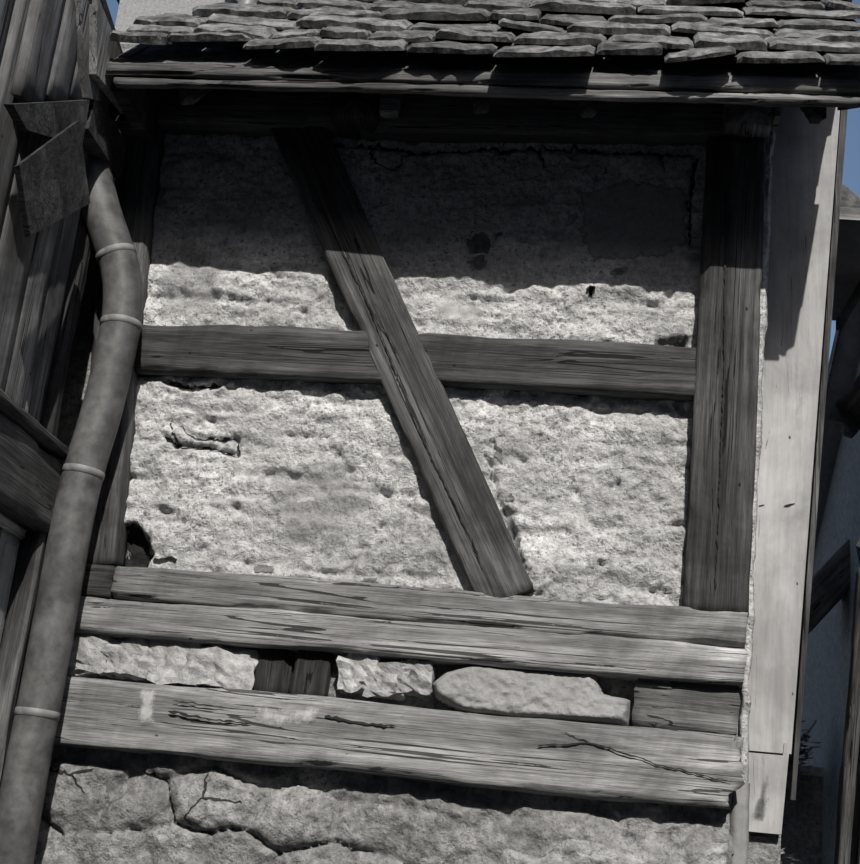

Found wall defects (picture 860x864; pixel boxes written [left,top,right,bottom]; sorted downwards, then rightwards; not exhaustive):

crack [334,142,699,246]
crack [320,206,480,558]
crack [715,154,727,588]
spalling [124,523,177,567]
crack [49,766,94,793]
crack [183,773,242,826]